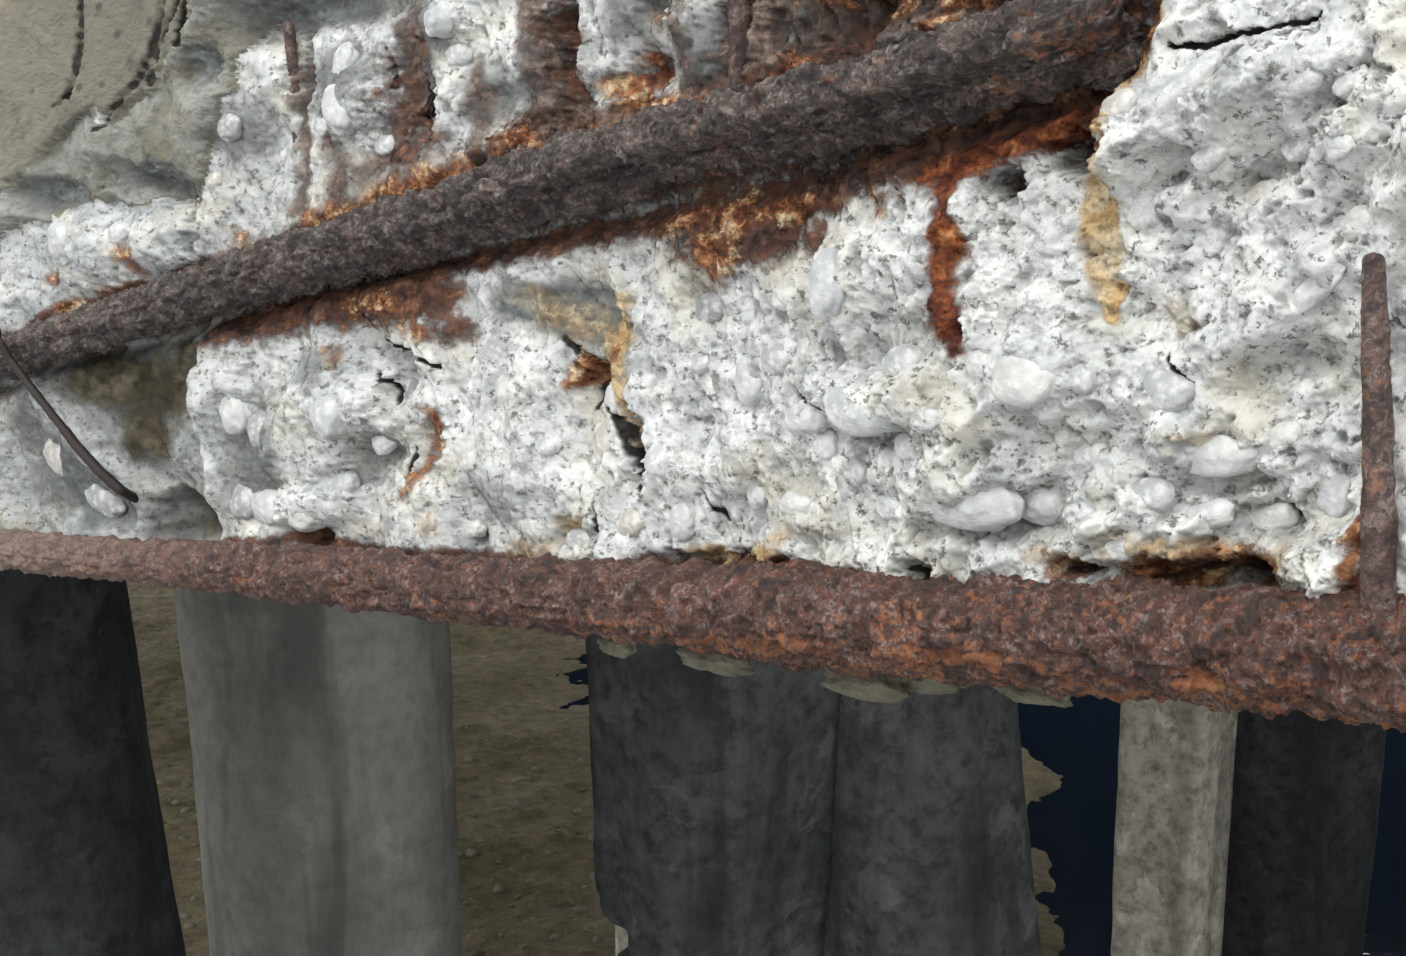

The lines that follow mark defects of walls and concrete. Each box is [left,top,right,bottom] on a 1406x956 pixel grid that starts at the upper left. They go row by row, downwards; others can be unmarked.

crack [1168,10,1323,50]
rust [138,0,1163,366]
rust [6,246,151,335]
spalling [0,0,1406,599]
rust [531,293,644,432]
crack [563,334,646,492]
rust [222,528,386,549]
rust [403,542,552,559]
rust [556,518,583,531]
crack [592,501,600,533]
rust [633,531,789,567]
rust [1038,536,1284,590]